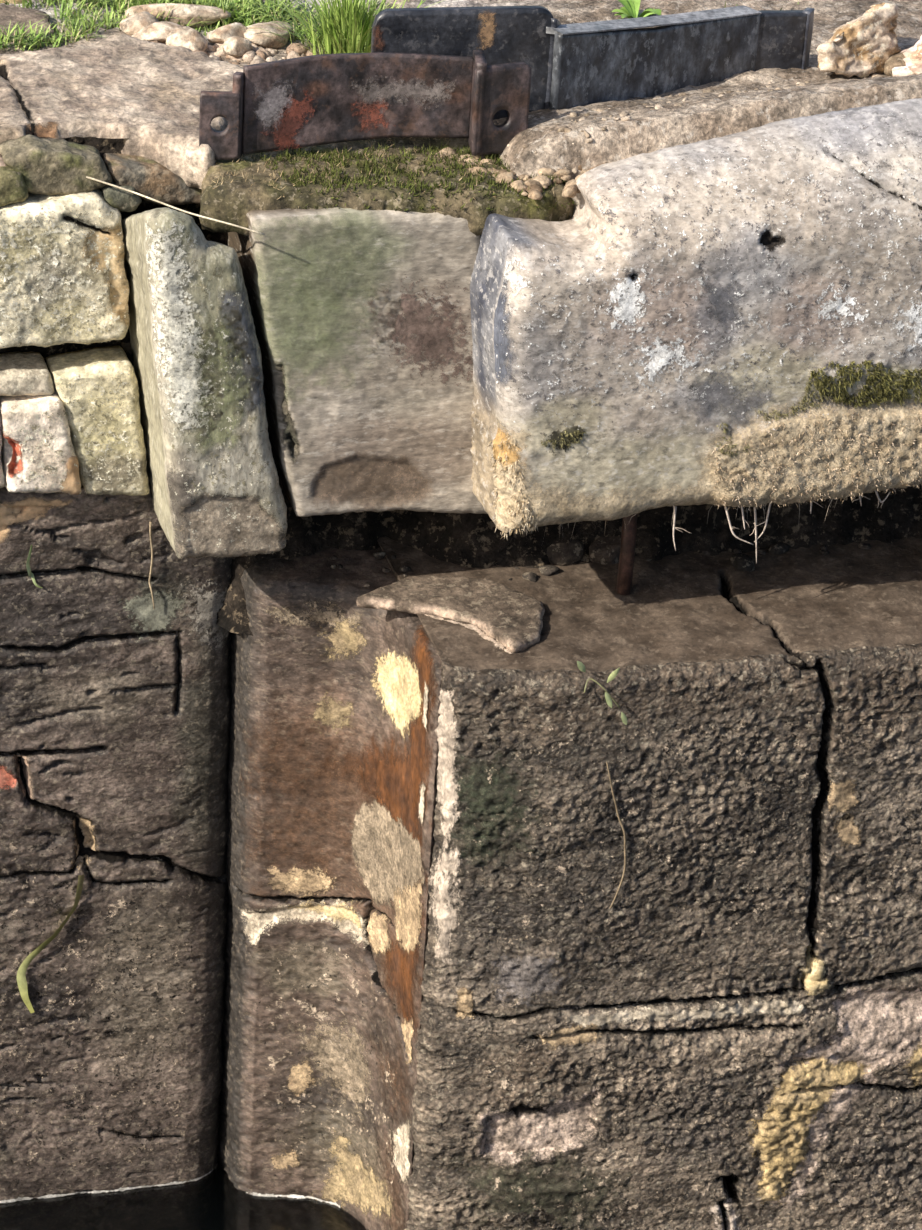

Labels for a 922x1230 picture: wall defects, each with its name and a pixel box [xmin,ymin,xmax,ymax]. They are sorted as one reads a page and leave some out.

rust [262,90,315,151]
crack [0,567,153,578]
crack [0,630,181,711]
crack [463,575,831,1039]
crack [835,967,922,987]
crack [718,1173,738,1230]